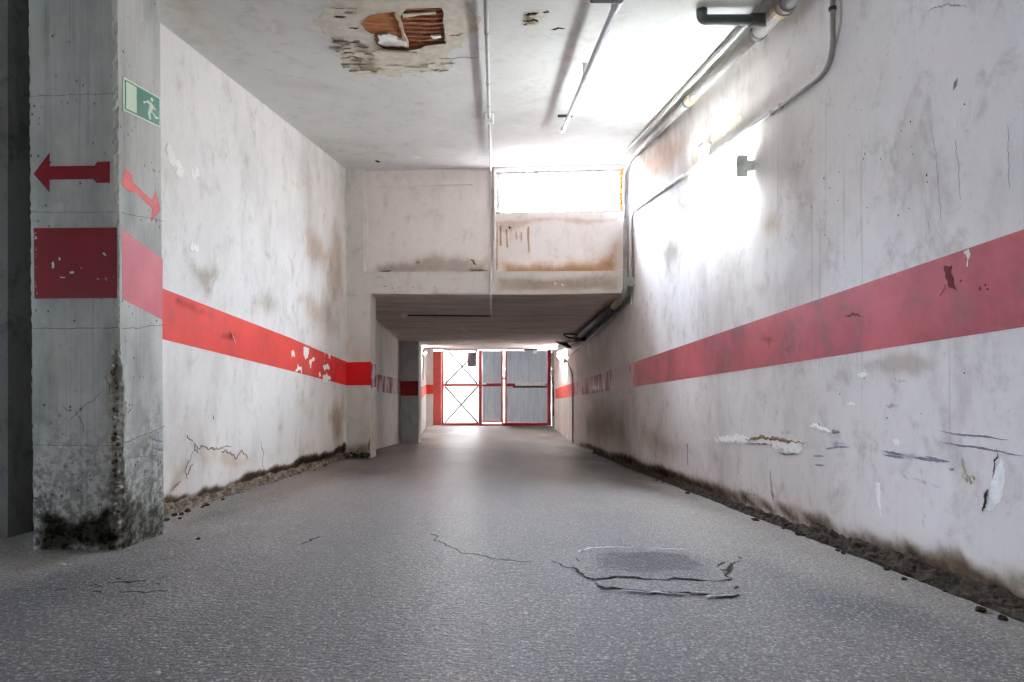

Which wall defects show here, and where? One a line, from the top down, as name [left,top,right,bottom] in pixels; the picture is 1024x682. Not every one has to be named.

peeling [313,0,482,77]
peeling [941,265,962,294]
peeling [291,347,331,382]
crack [62,376,110,433]
water stain [164,443,346,503]
water stain [580,444,833,530]
spalling [704,431,808,455]
spalling [592,450,1024,622]
water stain [851,535,1024,600]